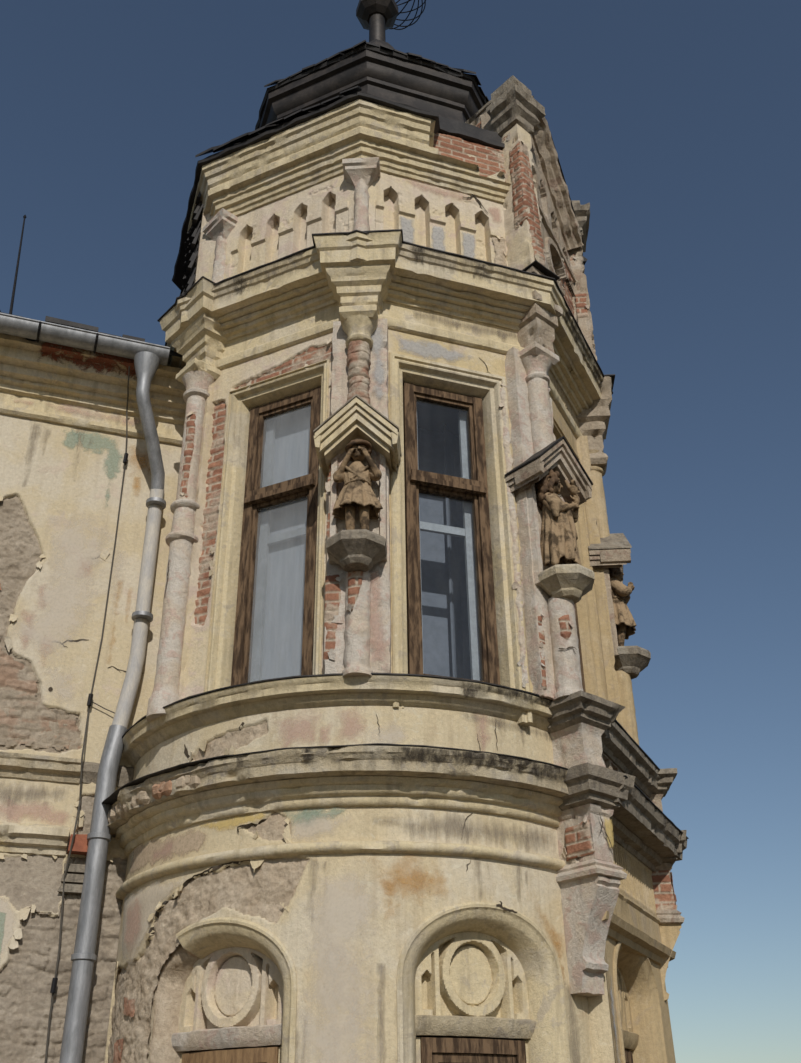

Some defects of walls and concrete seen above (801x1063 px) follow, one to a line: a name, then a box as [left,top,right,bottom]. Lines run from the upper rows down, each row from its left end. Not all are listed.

flaking render [432,132,546,267]
flaking render [0,496,82,753]
flaking render [107,775,201,837]
leakage [402,747,566,781]
flaking render [563,815,595,861]
flaking render [0,795,94,1063]
flaking render [82,808,343,1063]